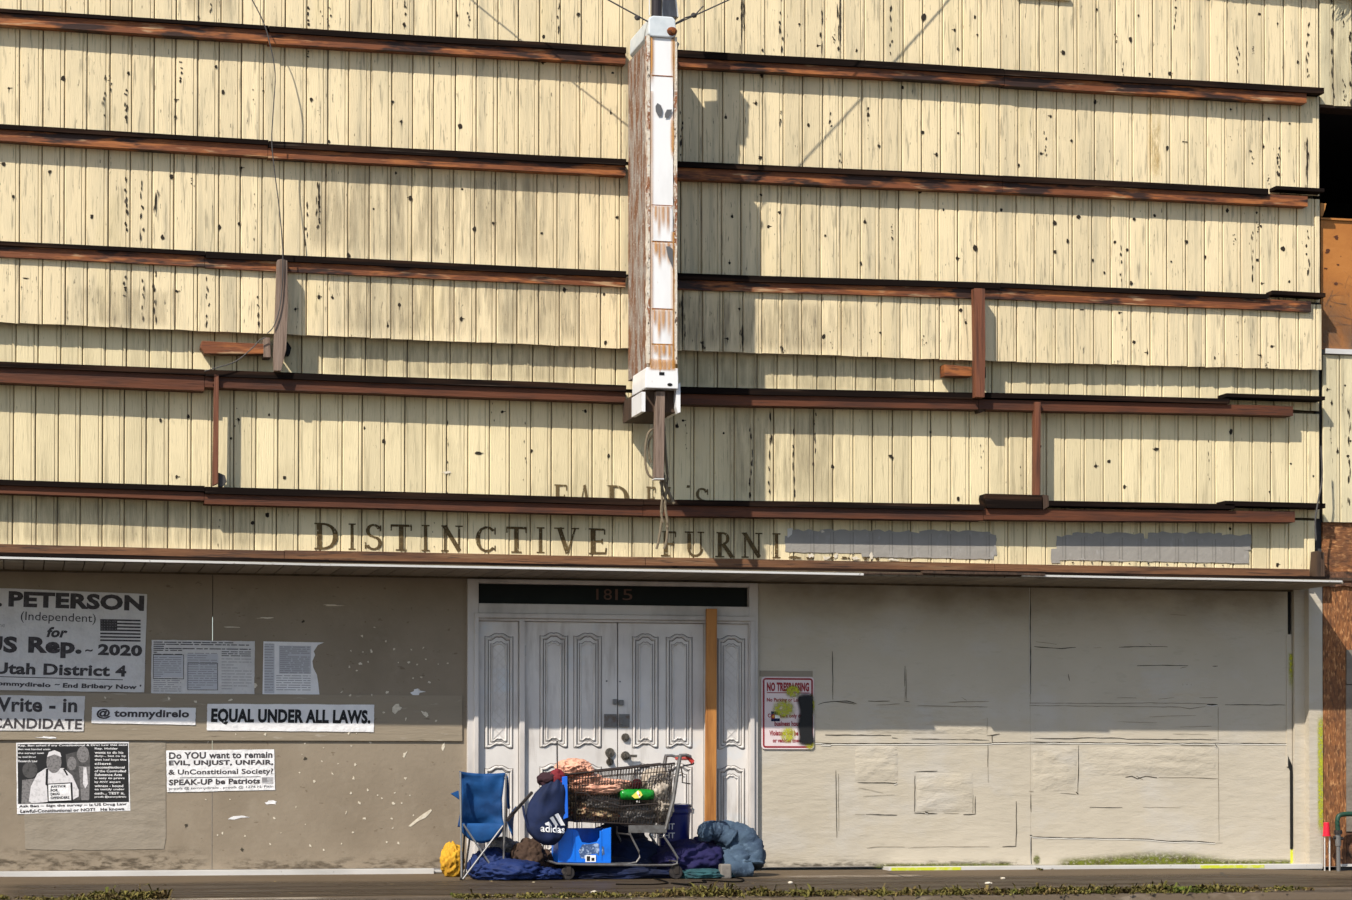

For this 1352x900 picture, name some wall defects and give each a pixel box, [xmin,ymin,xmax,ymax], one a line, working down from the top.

rust [651,206,675,370]